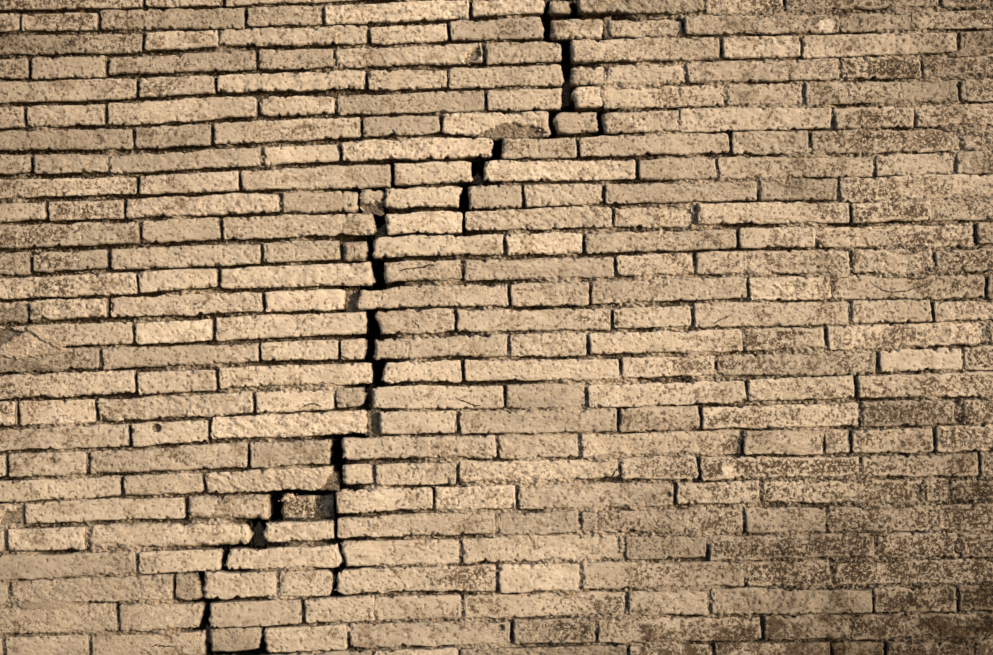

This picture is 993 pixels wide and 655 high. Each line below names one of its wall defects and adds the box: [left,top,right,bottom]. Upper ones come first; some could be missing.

crack [541,0,612,139]
crack [459,138,519,235]
crack [200,163,436,655]